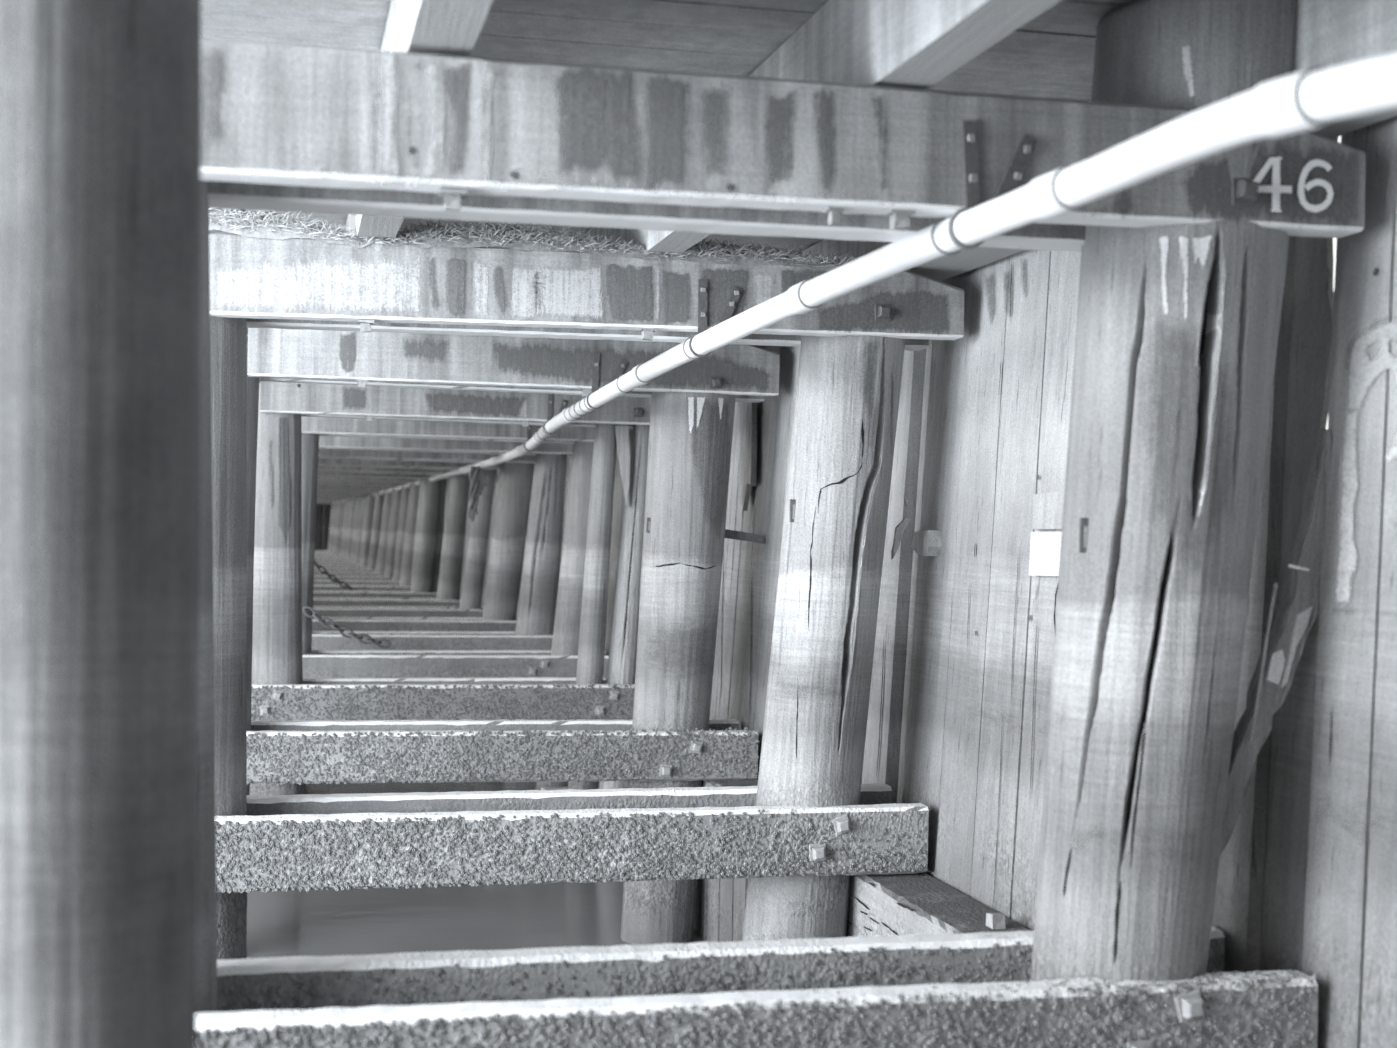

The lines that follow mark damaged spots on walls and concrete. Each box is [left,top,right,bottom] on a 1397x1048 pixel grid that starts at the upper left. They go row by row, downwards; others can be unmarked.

leakage [555,69,685,193]
leakage [766,93,795,183]
leakage [814,90,836,188]
leakage [217,258,826,324]
peeling [1336,322,1397,604]
crack [808,419,864,628]
crack [793,677,801,759]
crack [1114,536,1172,963]
crack [1203,635,1217,764]
crack [1326,708,1334,766]
crack [1063,849,1071,896]